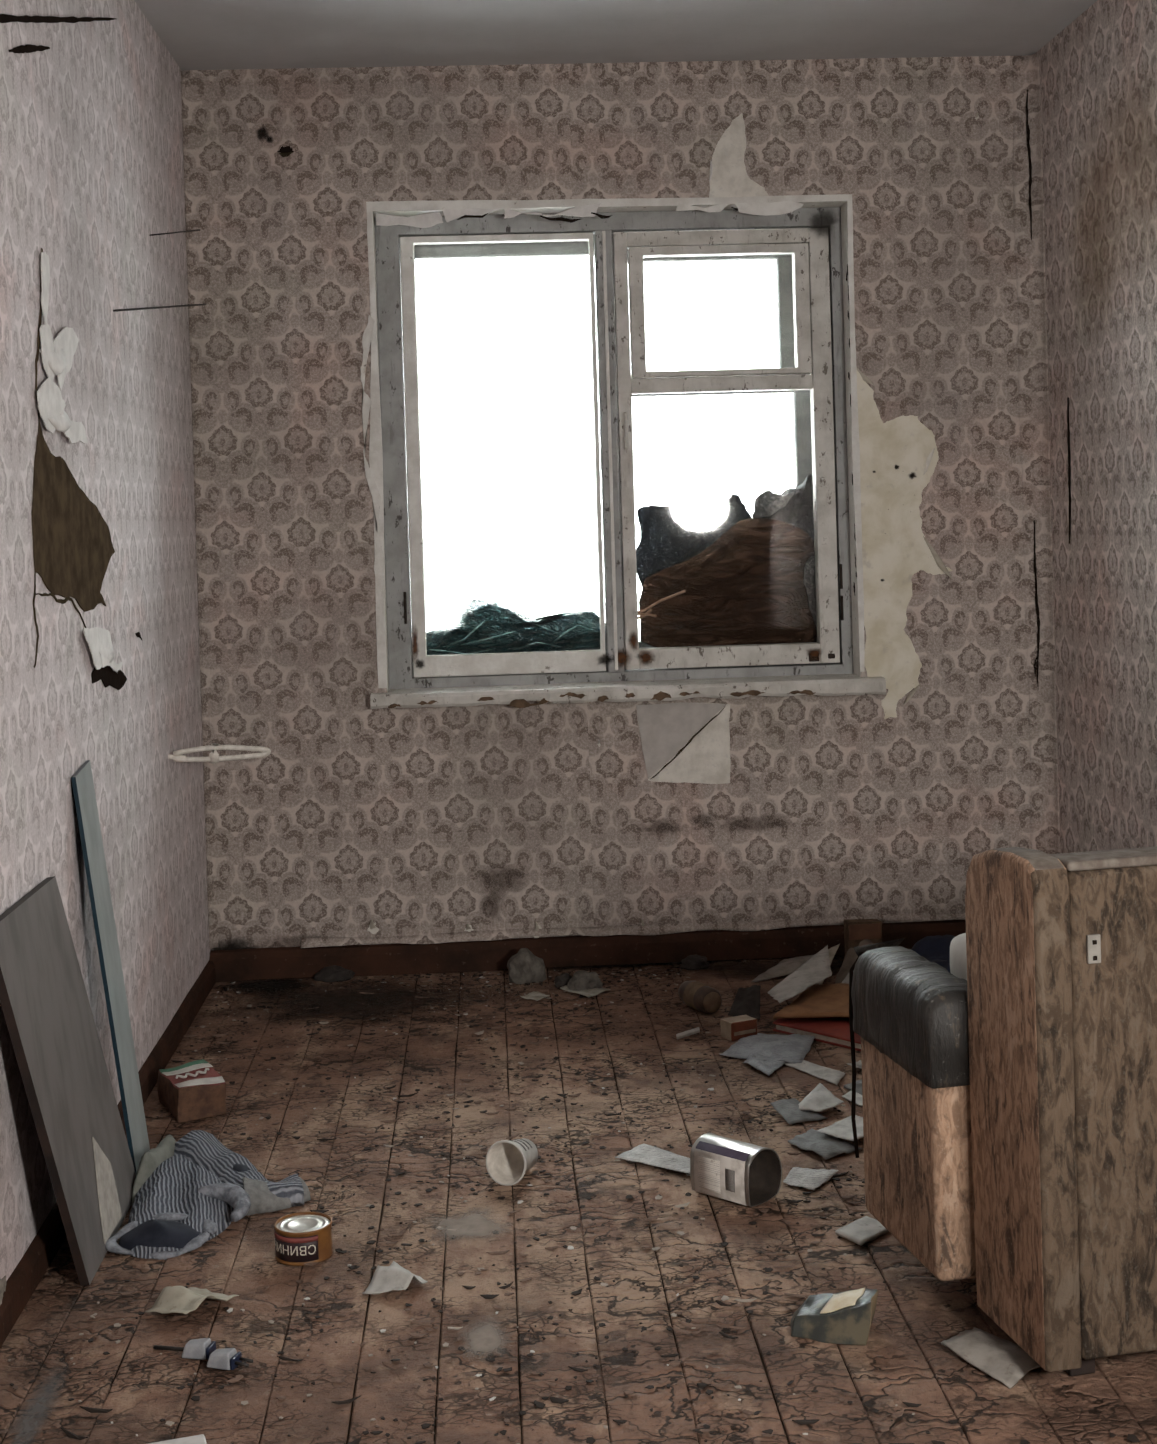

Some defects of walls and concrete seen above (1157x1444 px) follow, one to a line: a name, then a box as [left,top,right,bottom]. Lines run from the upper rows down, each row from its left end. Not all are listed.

peeling [376,203,612,228]
peeling [676,113,804,216]
crack [1025,90,1033,240]
peeling [848,367,953,719]
crack [1034,397,1071,684]
peeling [477,690,765,784]